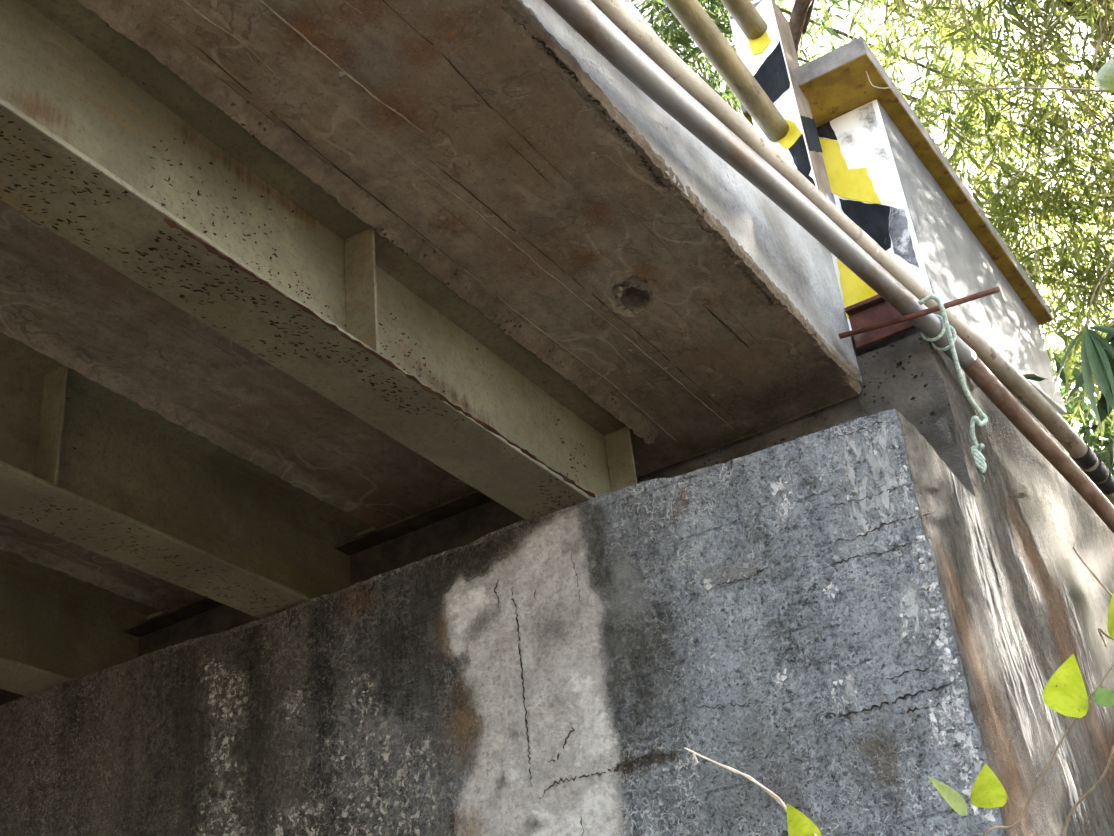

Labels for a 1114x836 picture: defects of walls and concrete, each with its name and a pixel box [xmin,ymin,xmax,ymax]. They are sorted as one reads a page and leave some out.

spalling [77,0,661,445]
crack [513,22,672,194]
spalling [501,0,861,383]
crack [494,577,681,799]
crack [817,668,959,718]
damp [944,469,1086,824]
damp [1056,571,1114,726]